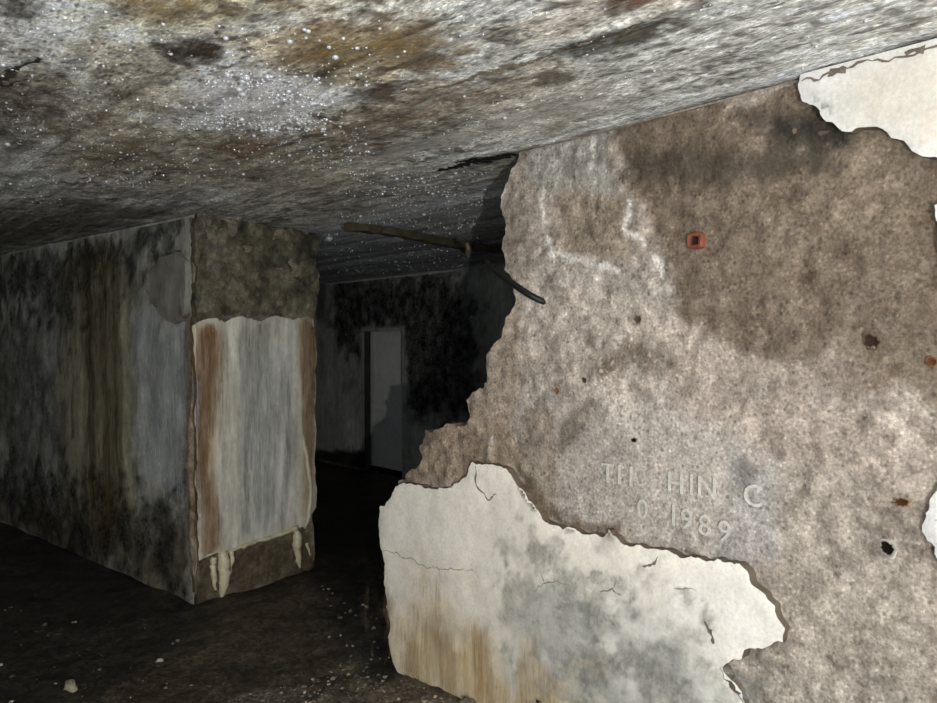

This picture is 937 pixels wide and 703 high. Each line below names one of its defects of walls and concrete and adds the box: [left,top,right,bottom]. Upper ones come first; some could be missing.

spalling [532,72,574,86]
leakage [775,113,846,167]
leakage [0,218,191,367]
corrosion [180,311,218,413]
leakage [600,344,642,375]
spalling [398,79,937,703]
leakage [0,330,187,597]
corrosion [194,428,219,554]
spalling [198,528,315,593]